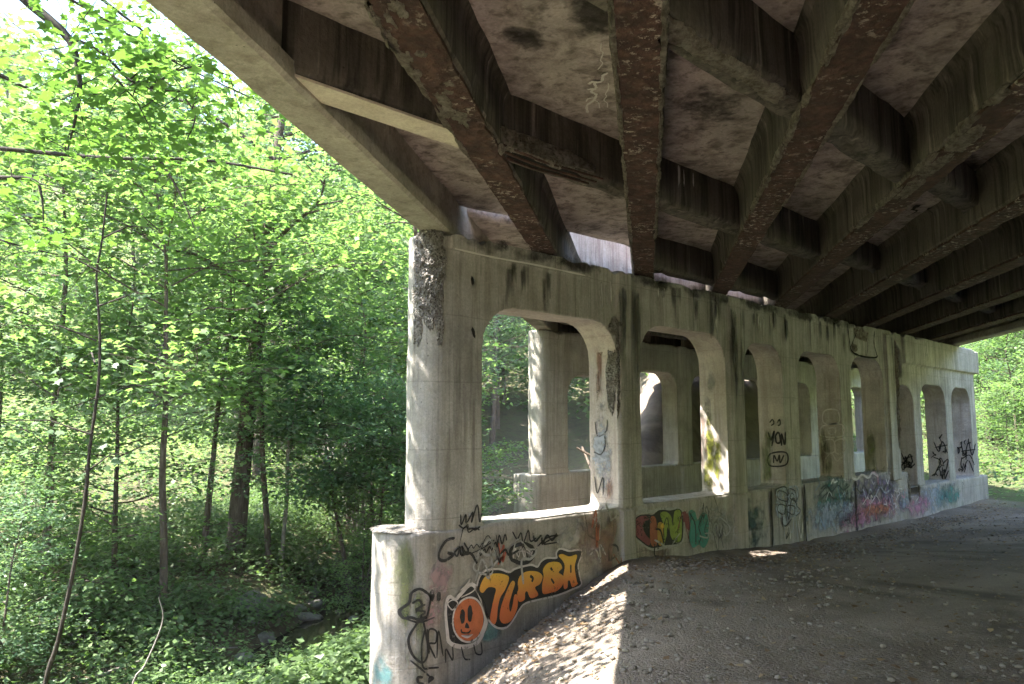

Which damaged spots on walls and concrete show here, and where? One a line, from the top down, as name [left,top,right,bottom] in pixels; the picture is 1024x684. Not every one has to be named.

rust [383,0,409,29]
rust [432,80,471,129]
spalling [412,229,447,348]
spalling [605,317,622,420]